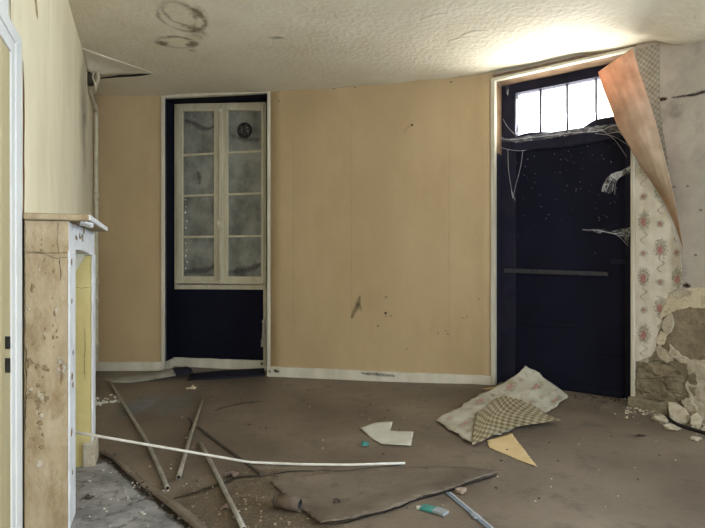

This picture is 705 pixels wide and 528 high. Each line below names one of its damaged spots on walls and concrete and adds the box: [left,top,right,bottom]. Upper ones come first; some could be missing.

damp [158,5,207,46]
crack [660,91,705,101]
crack [22,62,66,430]
spalling [635,283,705,423]
peeling [26,358,50,449]